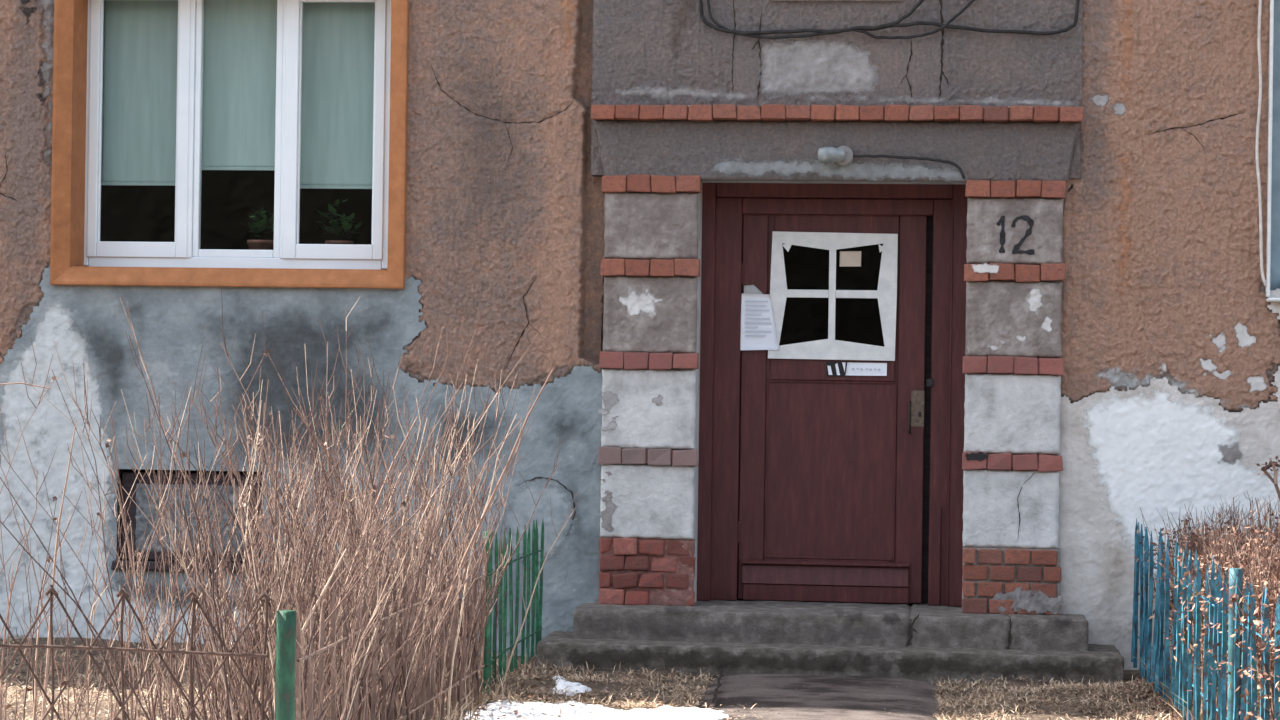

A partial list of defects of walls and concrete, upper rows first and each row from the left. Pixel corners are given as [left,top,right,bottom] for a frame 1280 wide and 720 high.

flaking render [0,267,619,657]
flaking render [992,364,1280,670]
flaking render [1199,322,1256,380]
flaking render [1267,289,1280,319]